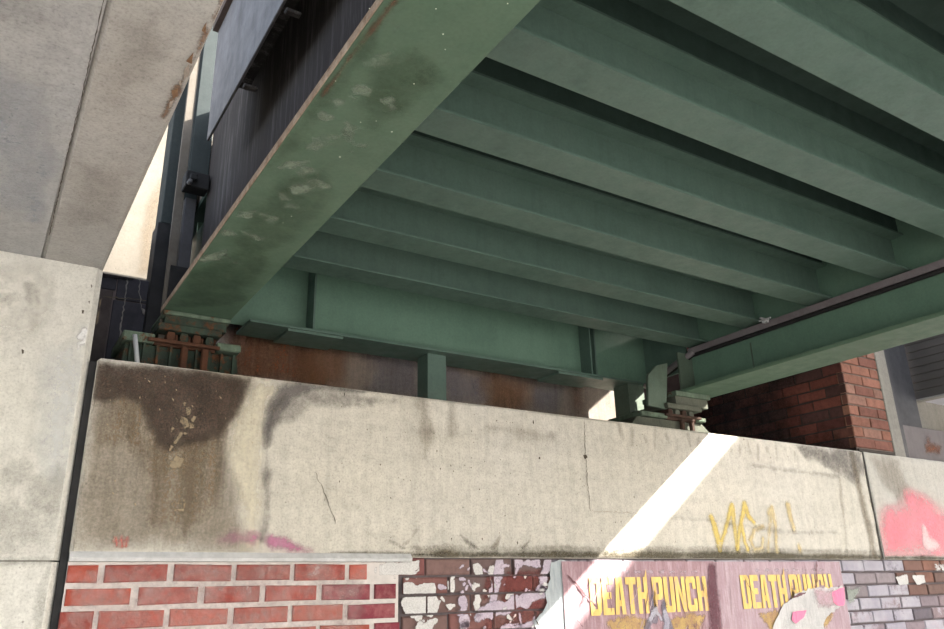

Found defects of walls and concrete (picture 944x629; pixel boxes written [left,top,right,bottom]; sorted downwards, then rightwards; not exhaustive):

corrosion [161,0,397,312]
corrosion [493,374,524,410]
water stain [84,363,358,546]
crack [583,423,650,514]
peeling [374,560,455,629]
peeling [472,563,495,611]